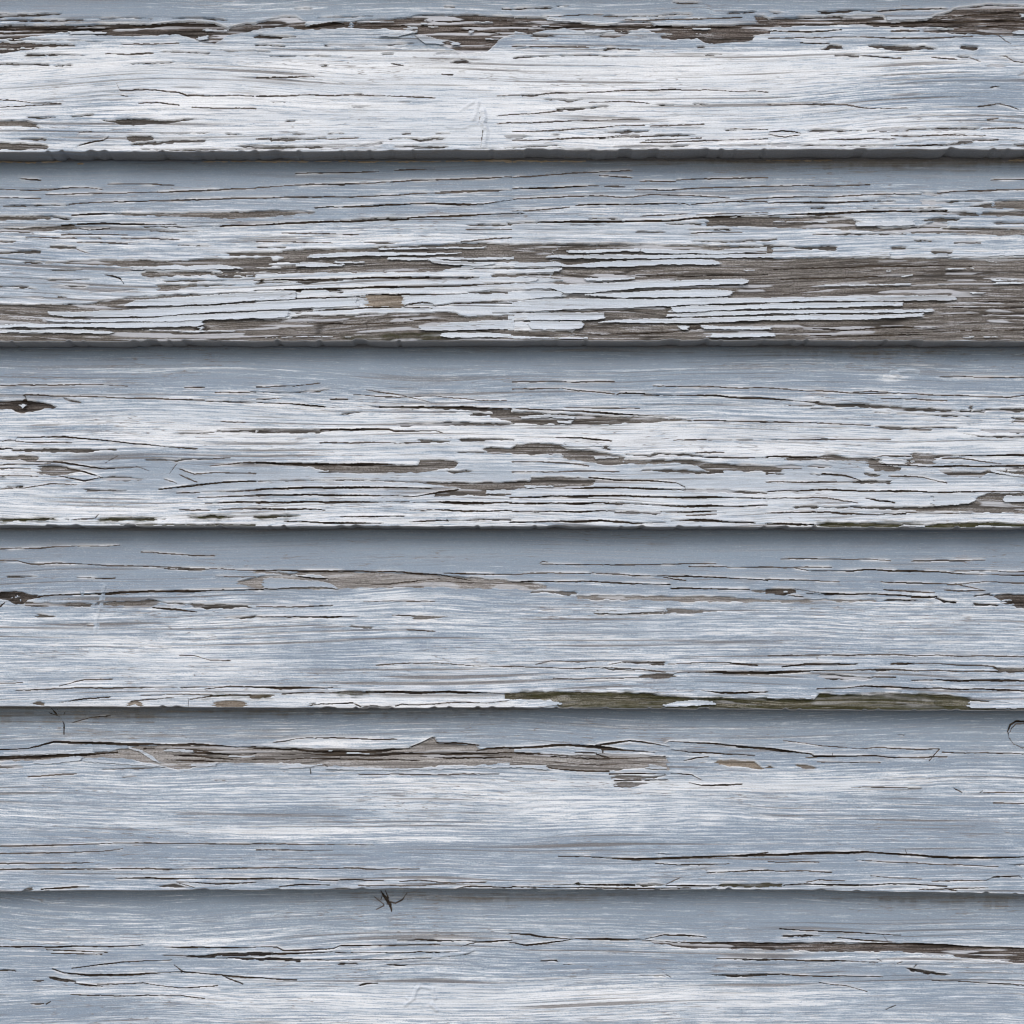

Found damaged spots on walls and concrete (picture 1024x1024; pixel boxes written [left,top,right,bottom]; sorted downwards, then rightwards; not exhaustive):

peeling [0,2,1024,79]
peeling [72,114,220,151]
peeling [497,89,1021,149]
peeling [0,179,1024,341]
peeling [641,394,1024,417]
peeling [0,448,143,492]
peeling [256,406,1024,528]
peeling [0,514,256,526]
peeling [237,570,876,615]
peeling [505,691,1024,710]
peeling [0,737,670,788]
crack [0,928,1024,1005]